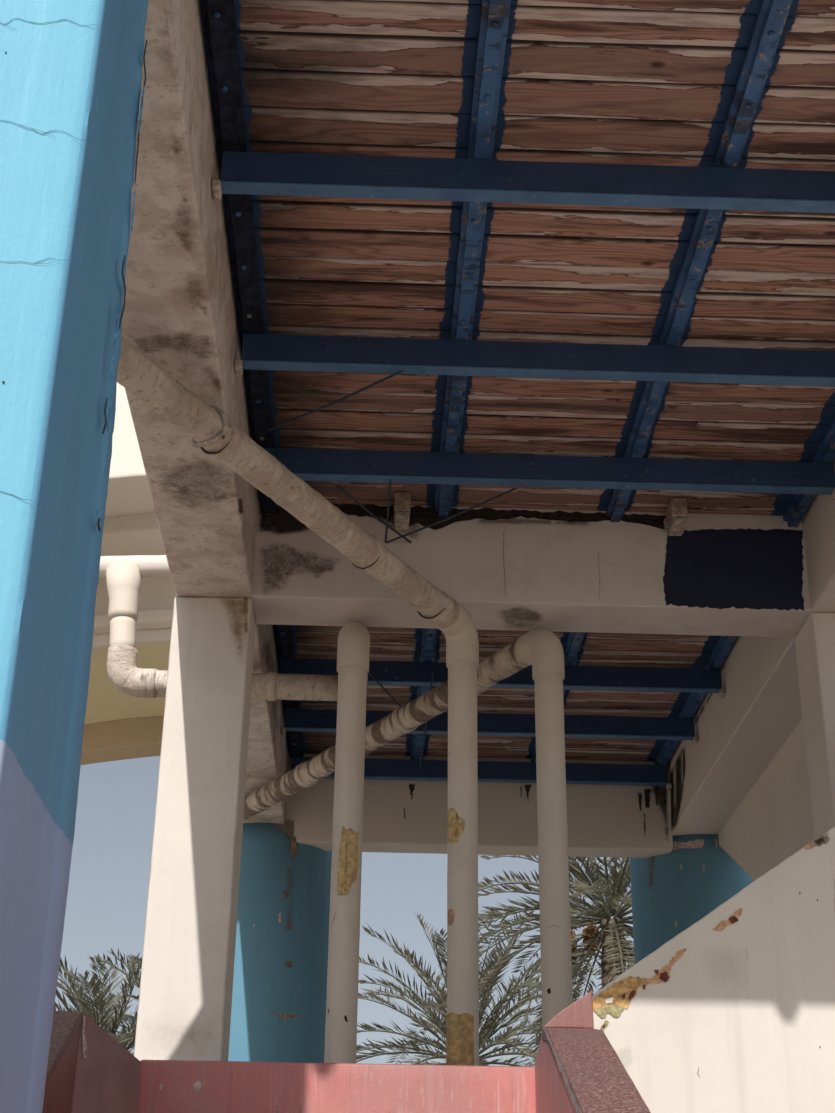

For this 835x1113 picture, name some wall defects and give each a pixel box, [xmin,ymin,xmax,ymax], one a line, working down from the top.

crack [0,18,95,29]
crack [1,120,87,142]
damp [259,506,333,588]
peeling [447,808,465,844]
peeling [336,826,359,896]
peeling [713,908,743,931]
peeling [592,948,687,1032]
peeling [446,1013,474,1065]